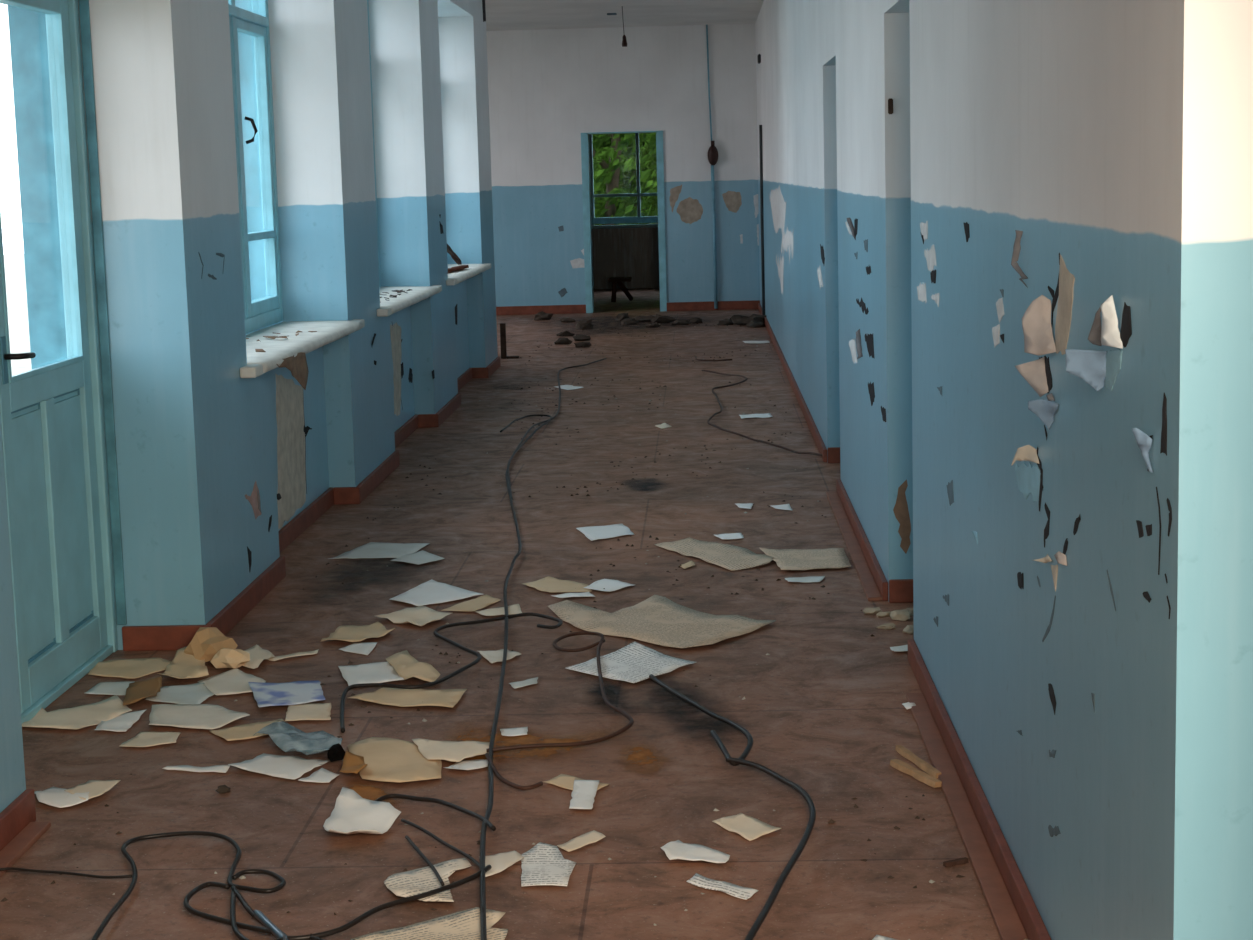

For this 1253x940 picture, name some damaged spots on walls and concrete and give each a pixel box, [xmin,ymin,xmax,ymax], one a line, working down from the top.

spalling [670,185,703,224]
peeling [246,331,317,352]
peeling [992,289,1004,348]
peeling [1011,230,1132,430]
peeling [245,352,312,531]
peeling [1011,445,1040,502]
peeling [1132,393,1167,473]
spalling [893,479,911,553]
peeling [1033,515,1081,592]
peeling [1136,520,1152,538]